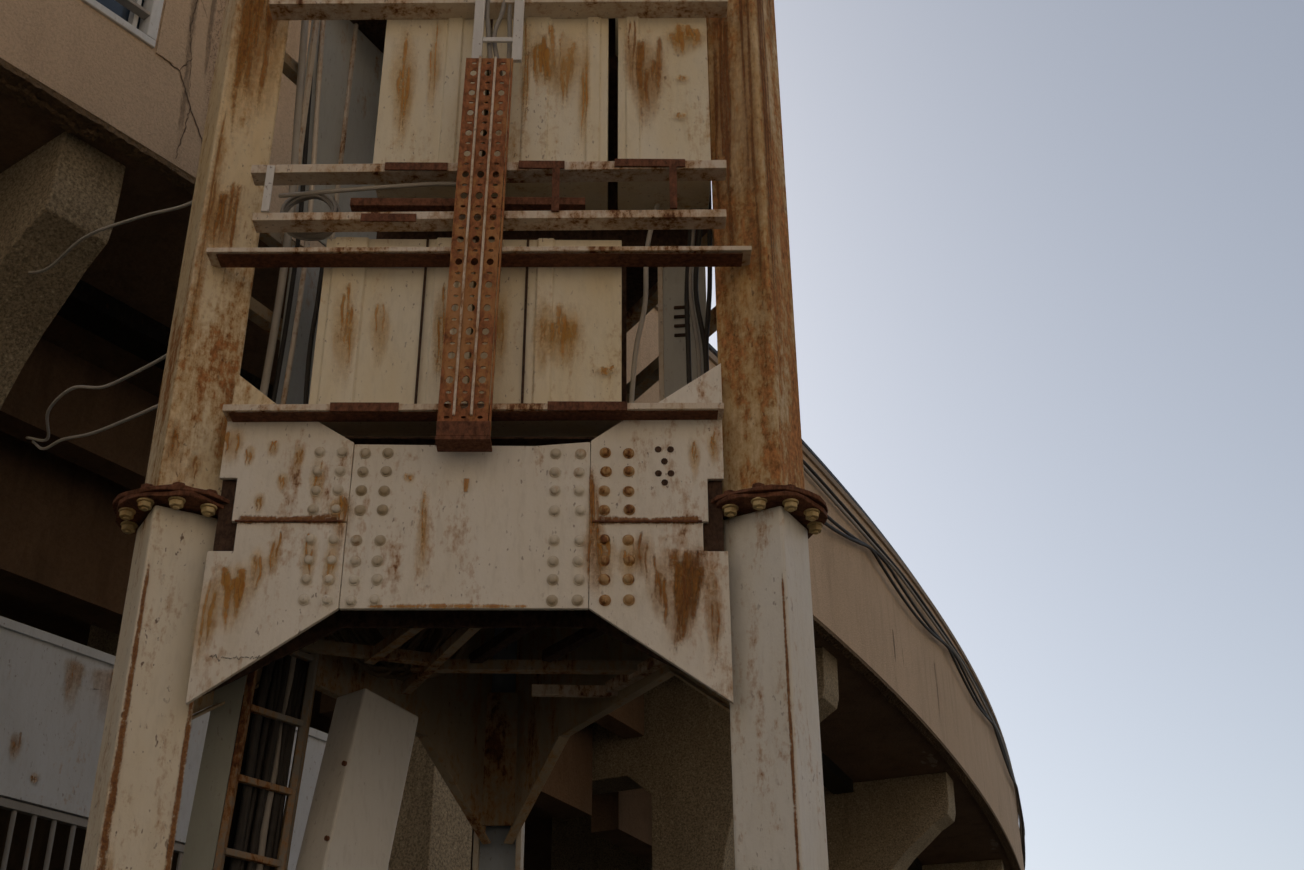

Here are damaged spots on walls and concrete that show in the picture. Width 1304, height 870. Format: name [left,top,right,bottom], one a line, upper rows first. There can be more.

crack [163,0,207,159]
corrosion [523,25,588,127]
corrosion [187,0,278,342]
corrosion [341,286,353,350]
corrosion [199,496,348,645]
corrosion [587,475,720,642]
corrosion [97,564,149,870]
corrosion [165,700,195,870]